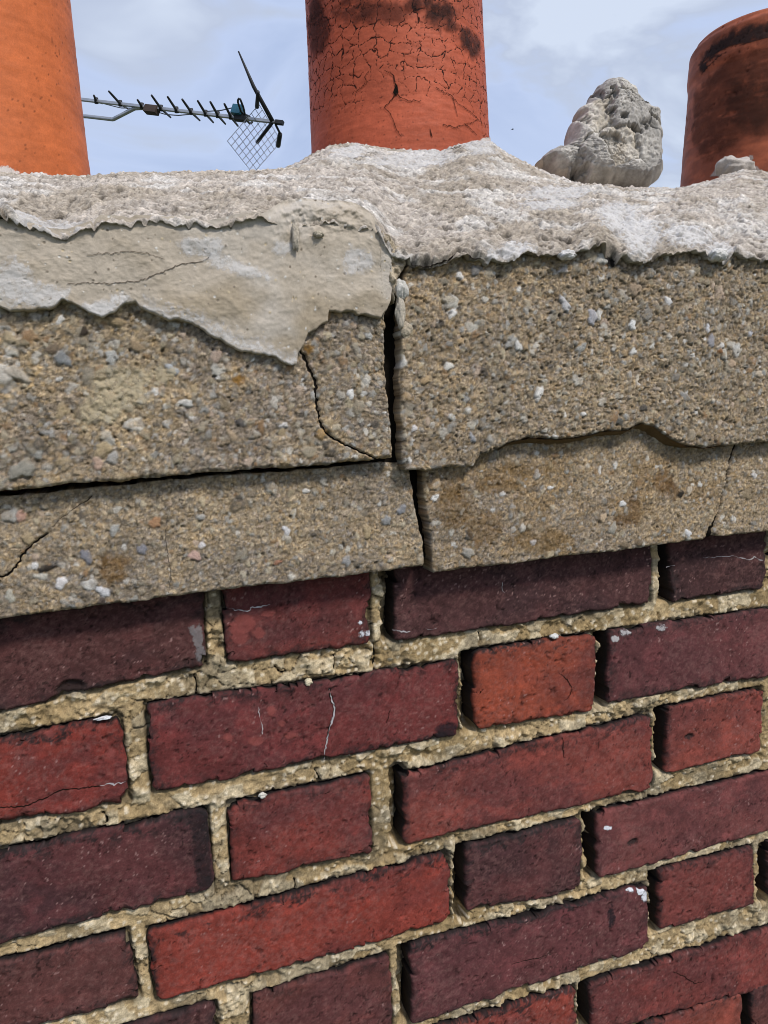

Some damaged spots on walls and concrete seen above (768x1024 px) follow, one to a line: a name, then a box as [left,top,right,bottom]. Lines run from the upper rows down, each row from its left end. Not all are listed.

crack [305,0,489,138]
peeling [0,198,392,365]
crack [299,292,426,557]
crack [0,496,92,577]
crack [706,445,763,561]
crack [314,654,336,778]